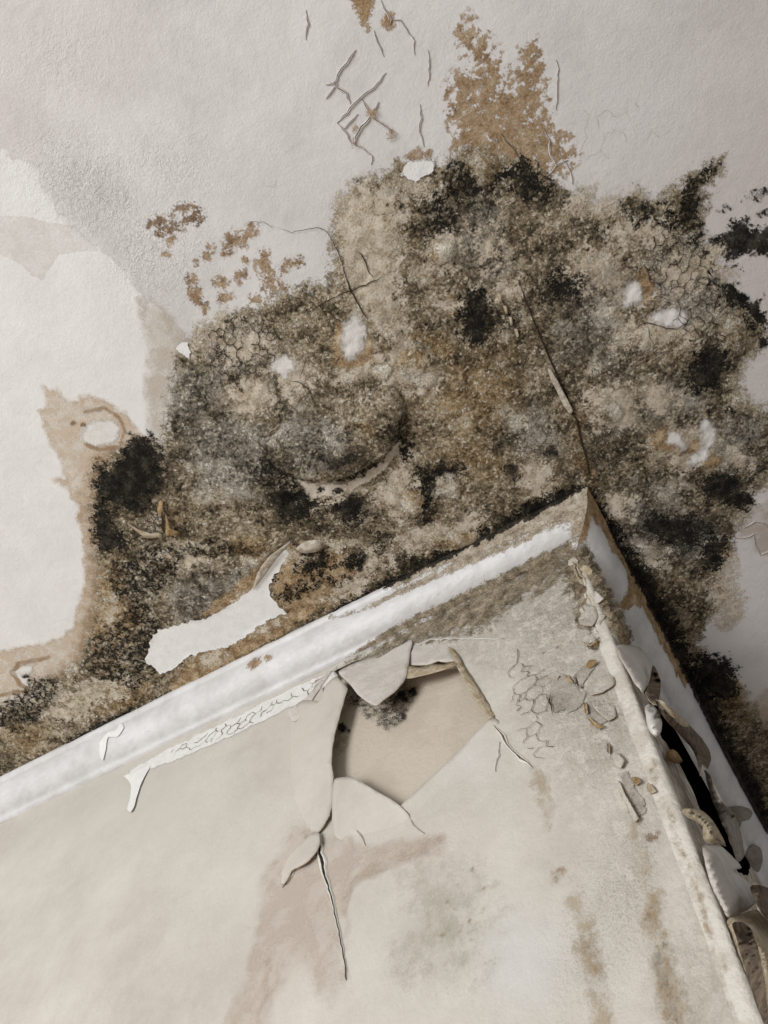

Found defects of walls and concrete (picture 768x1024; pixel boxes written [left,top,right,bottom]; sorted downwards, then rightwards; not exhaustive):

crack [326,1,430,164]
crack [497,284,591,479]
damp [0,144,768,828]
spalling [145,538,369,691]
peeling [280,639,499,885]
peeling [546,546,768,1024]
crack [283,810,347,981]